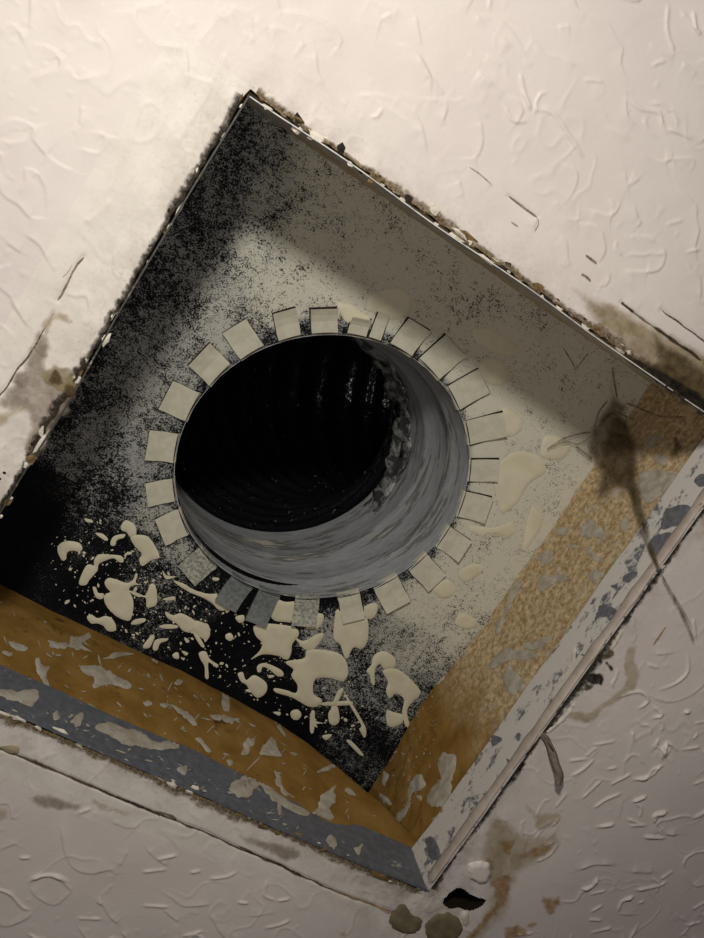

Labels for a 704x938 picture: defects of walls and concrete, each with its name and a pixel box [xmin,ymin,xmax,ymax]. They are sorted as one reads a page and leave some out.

leakage [3,315,76,453]
crack [0,257,84,395]
spalling [0,94,244,518]
spalling [255,88,654,369]
leakage [591,305,704,416]
spalling [0,503,704,895]
crack [0,748,392,914]
peeling [460,910,470,928]